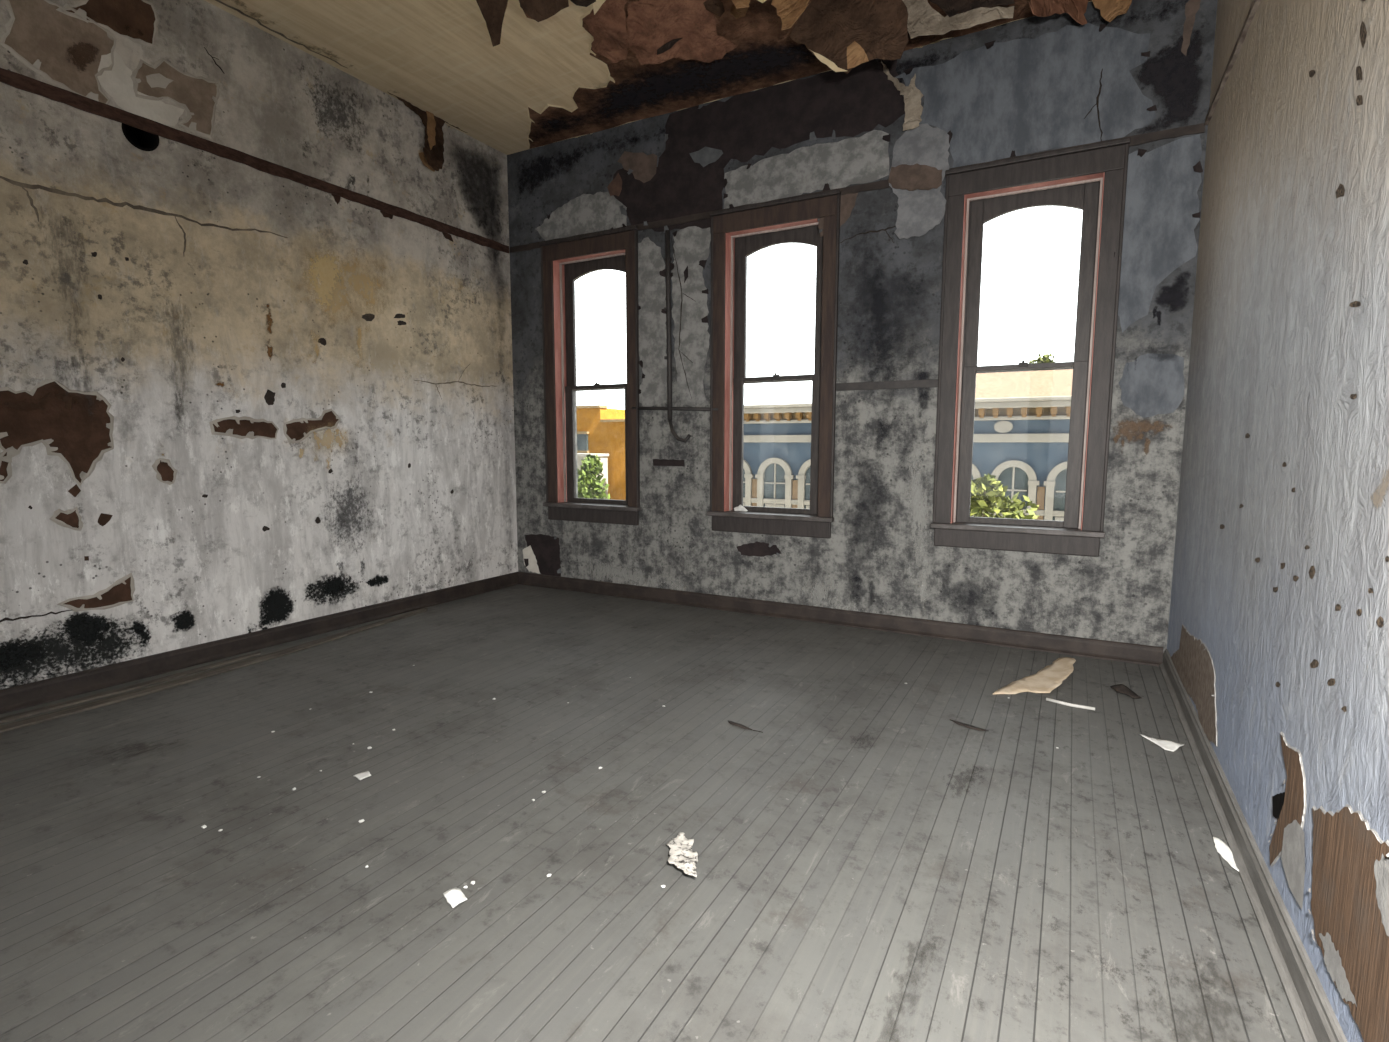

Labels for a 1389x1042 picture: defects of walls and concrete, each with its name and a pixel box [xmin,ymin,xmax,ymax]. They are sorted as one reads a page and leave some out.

peeling [0,0,220,139]
peeling [388,92,467,172]
crack [0,176,287,256]
peeling [476,0,1157,407]
peeling [1114,134,1203,333]
peeling [0,379,114,531]
peeling [209,383,341,443]
damp [0,612,151,690]
damp [171,610,195,632]
damp [585,559,684,591]
damp [906,451,932,615]
peeling [1268,731,1389,1042]